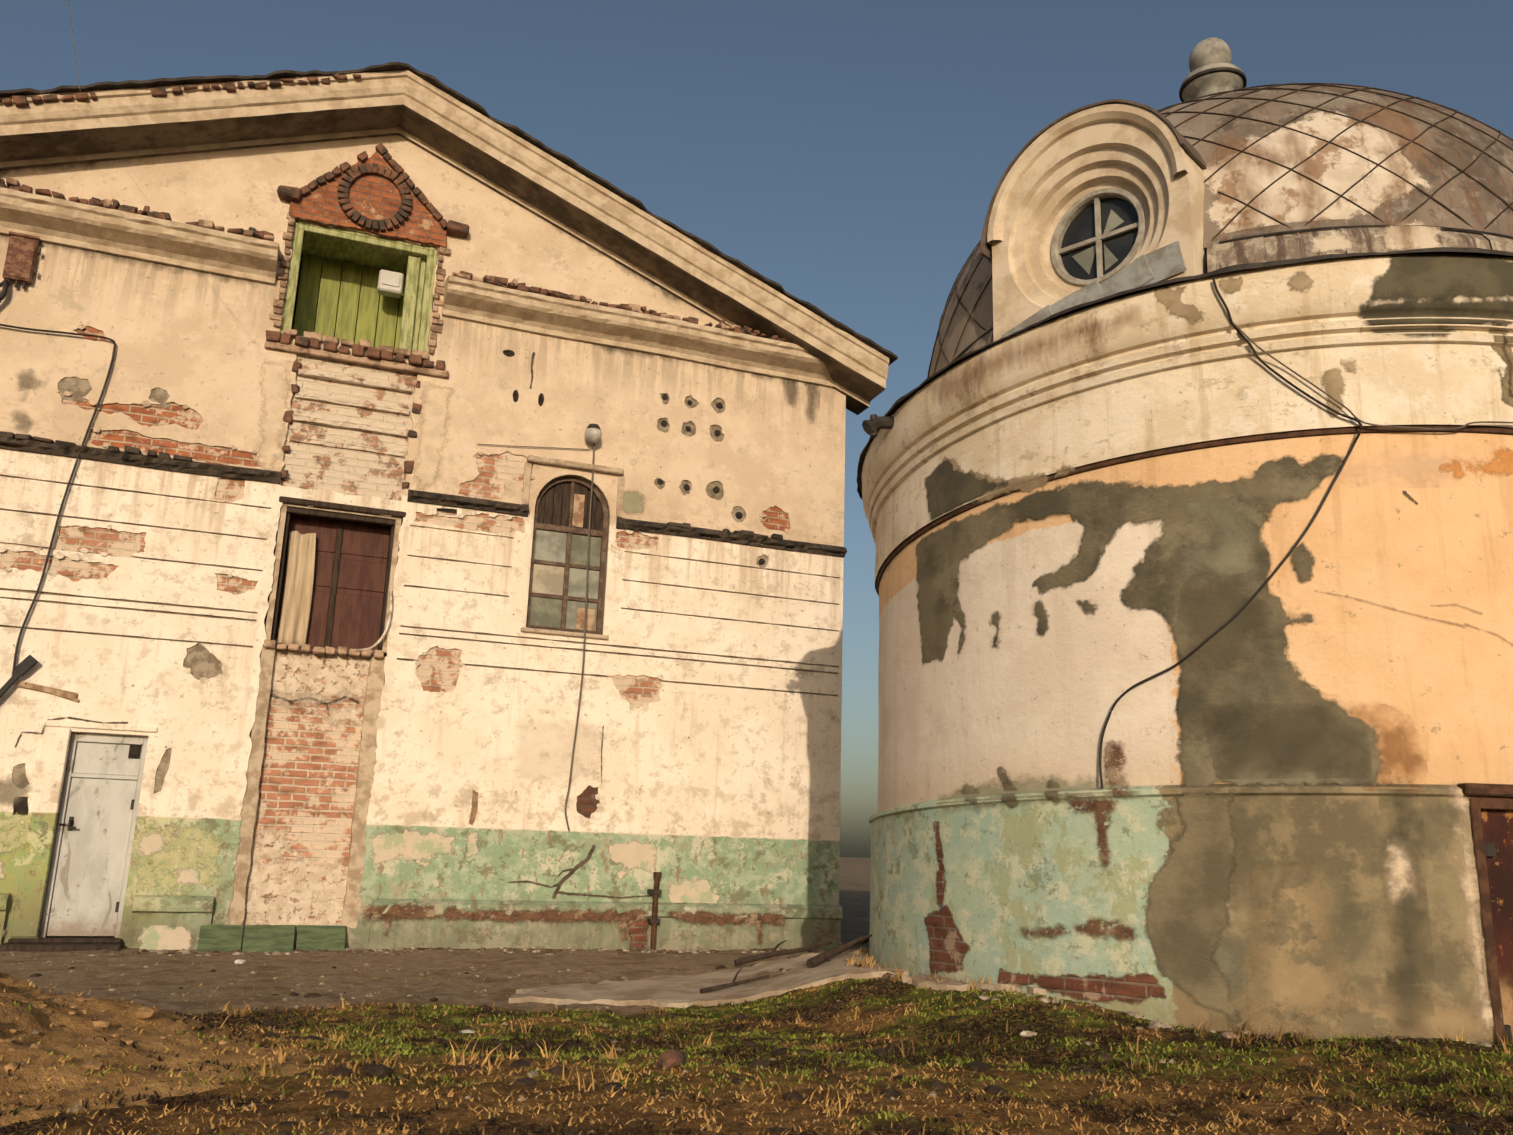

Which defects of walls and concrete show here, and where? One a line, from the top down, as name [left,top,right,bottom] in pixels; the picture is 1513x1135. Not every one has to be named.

spalling [283,361,302,424]
spalling [408,364,422,438]
crack [1489,319,1513,406]
spalling [0,377,262,505]
spalling [402,461,414,489]
spalling [0,525,146,582]
spalling [413,646,465,693]
spalling [608,674,664,711]
peeling [0,763,30,879]
spalling [576,785,602,818]
spalling [924,821,970,975]
spalling [997,968,1166,1004]